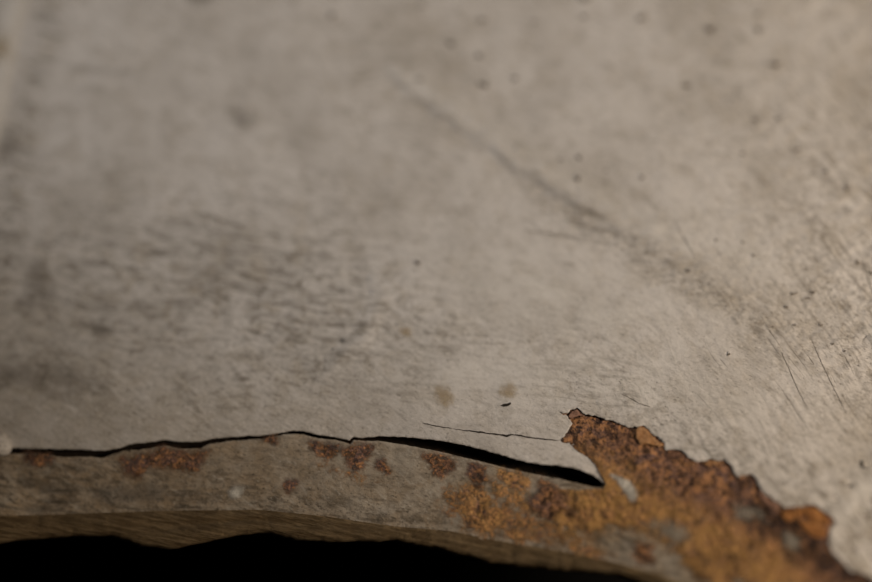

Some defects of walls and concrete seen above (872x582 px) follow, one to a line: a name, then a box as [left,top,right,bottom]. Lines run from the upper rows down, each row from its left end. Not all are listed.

rust [120,446,209,477]
crack [10,423,601,487]
rust [308,440,392,482]
rust [422,453,456,478]
rust [457,463,569,536]
peeling [546,408,872,582]